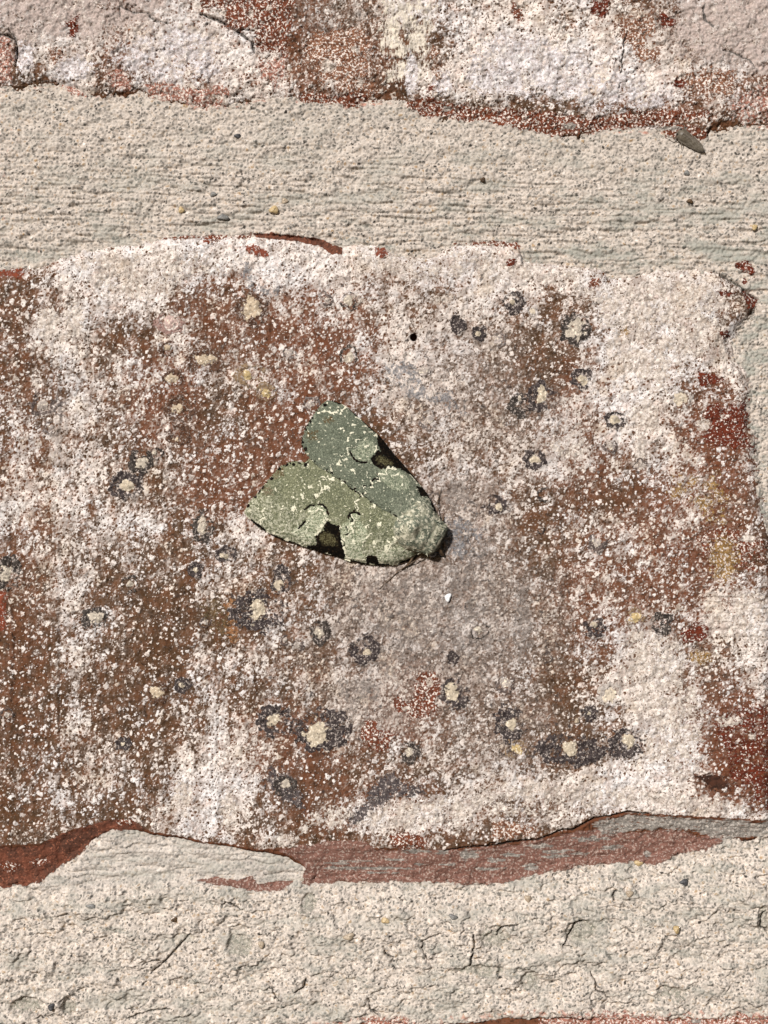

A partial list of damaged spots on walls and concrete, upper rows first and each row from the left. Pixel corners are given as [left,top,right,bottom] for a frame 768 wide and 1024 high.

crack [470,924,518,965]